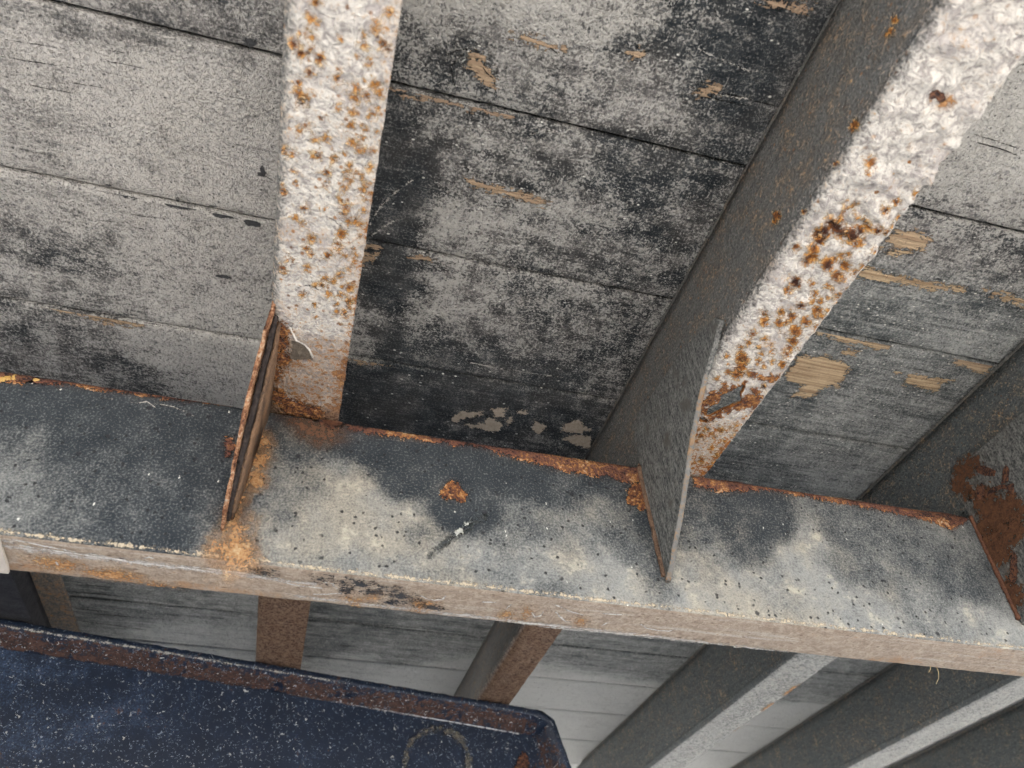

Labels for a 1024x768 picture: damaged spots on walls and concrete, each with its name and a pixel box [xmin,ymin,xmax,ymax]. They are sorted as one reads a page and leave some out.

peeling [464,49,499,90]
rust [278,0,394,326]
peeling [856,226,968,296]
peeling [784,331,892,399]
rust [272,316,646,511]
peeling [451,407,547,434]
peeling [559,420,592,449]
rust [693,191,1024,612]
rust [209,435,271,579]